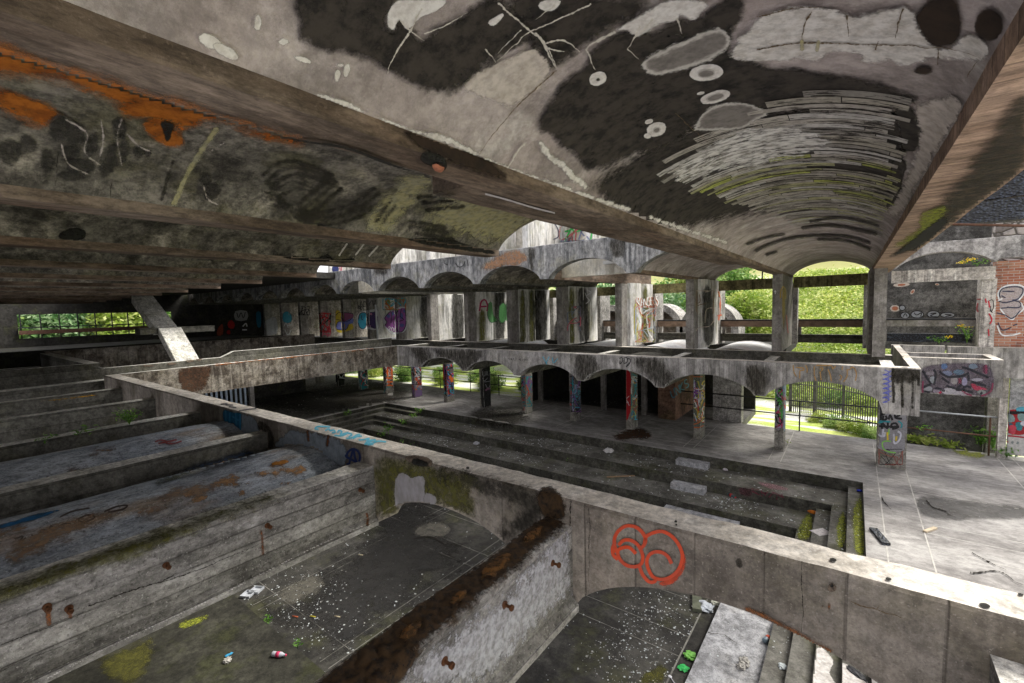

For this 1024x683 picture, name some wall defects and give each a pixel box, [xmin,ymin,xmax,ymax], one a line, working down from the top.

crack [757,6,981,77]
corrosion [0,47,302,147]
water stain [890,217,947,257]
corrosion [138,459,306,516]
peeling [394,455,436,508]
water stain [432,470,545,540]
water stain [264,502,465,656]
water stain [38,558,292,683]